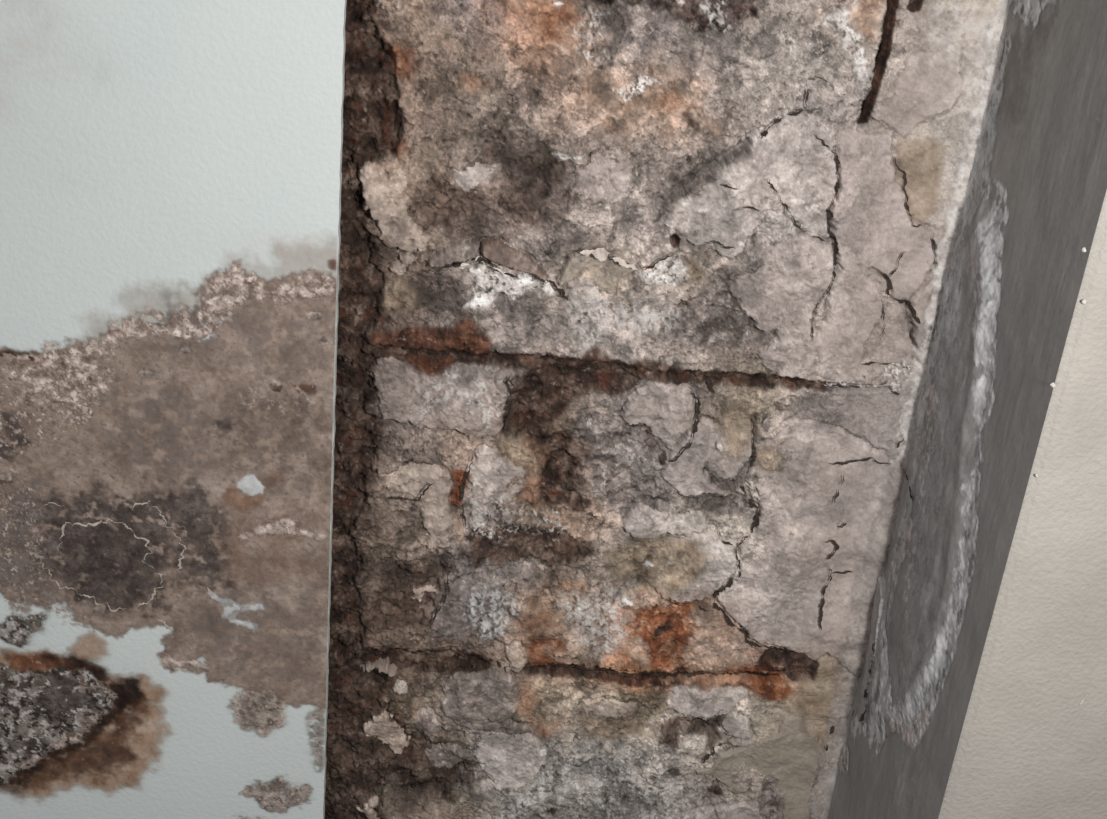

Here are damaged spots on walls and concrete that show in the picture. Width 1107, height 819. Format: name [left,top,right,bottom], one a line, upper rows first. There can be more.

crack [760,77,828,139]
corrosion [372,317,491,375]
crack [474,256,569,301]
corrosion [583,346,674,377]
crack [642,256,671,271]
crack [669,135,938,462]
damp [798,21,1010,819]
damp [0,262,336,772]
crack [699,418,781,649]
crack [819,435,913,630]
corrosion [516,604,578,676]
corrosion [595,587,793,701]